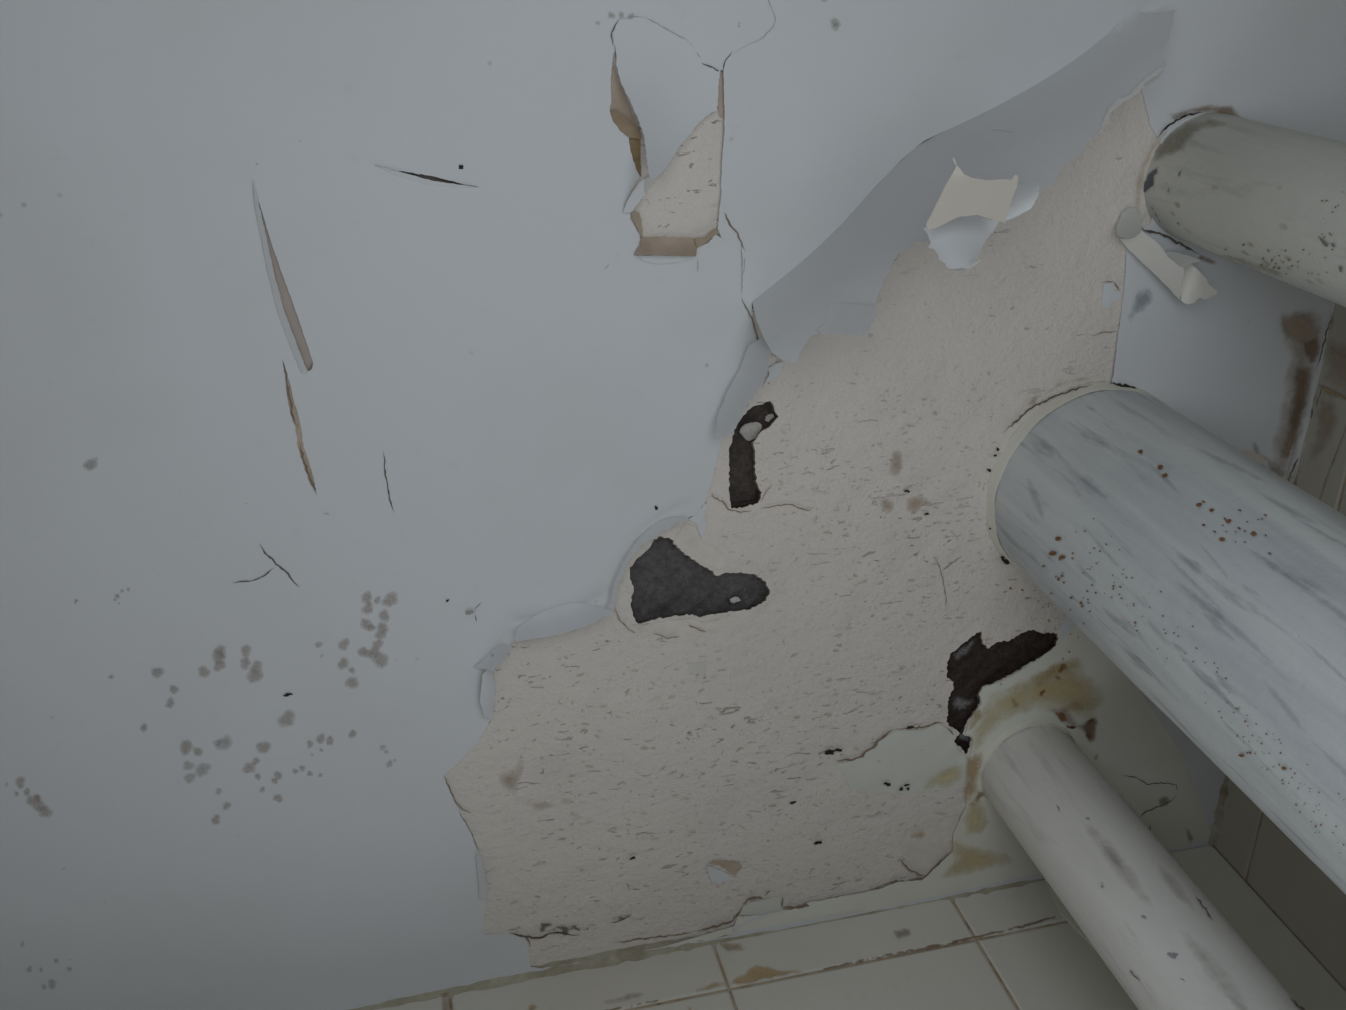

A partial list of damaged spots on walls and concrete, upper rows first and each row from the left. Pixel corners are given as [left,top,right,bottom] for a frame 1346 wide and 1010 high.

peeling [444,9,1218,966]